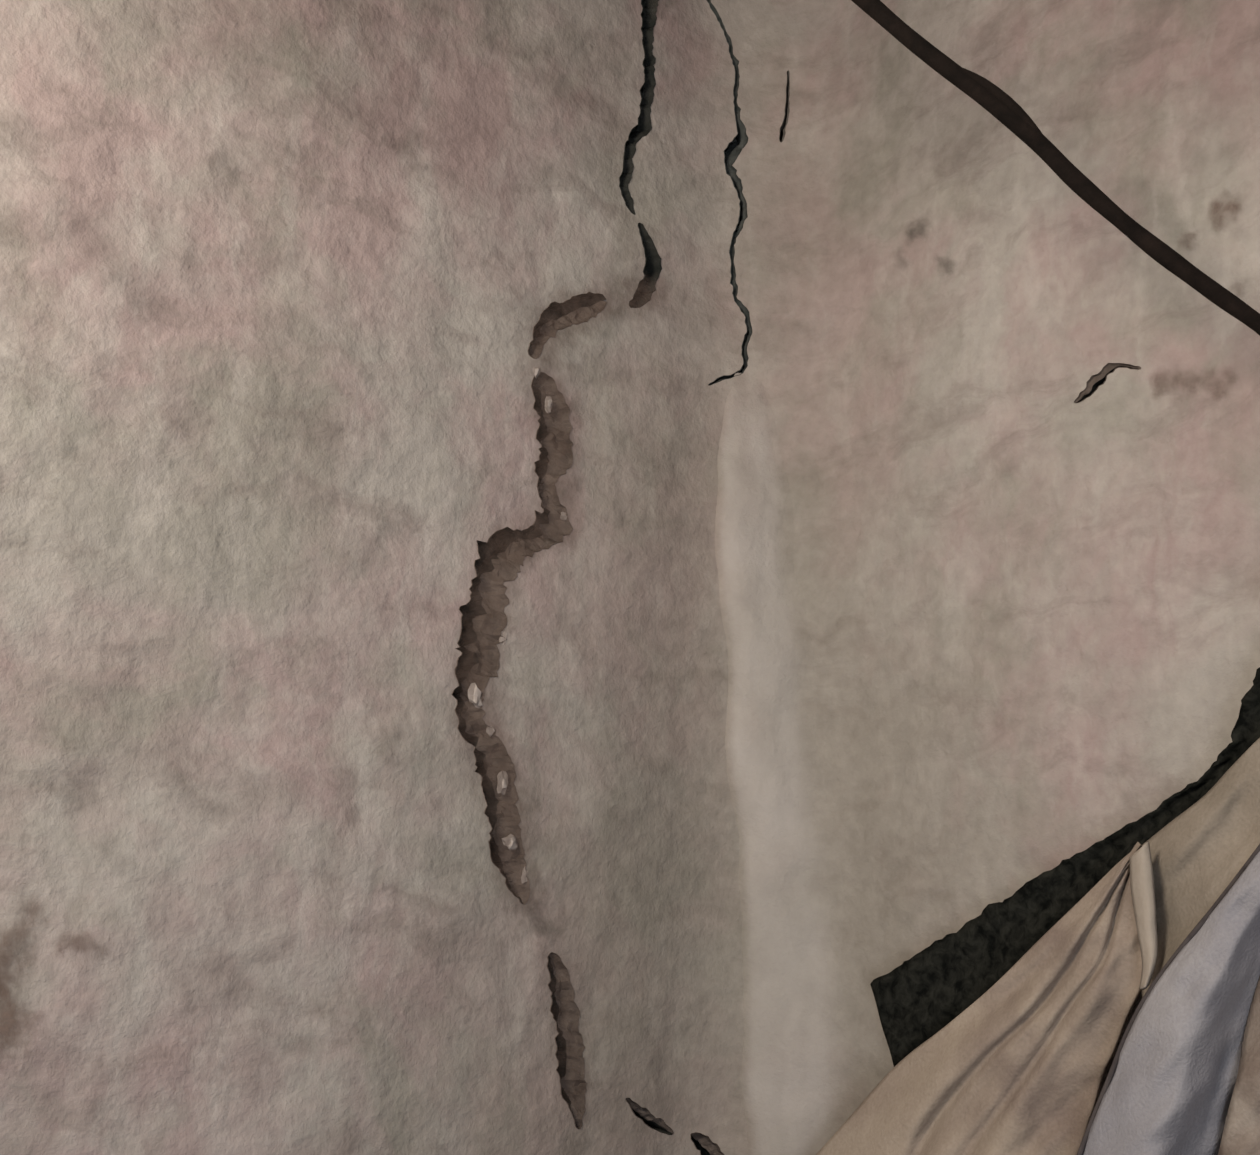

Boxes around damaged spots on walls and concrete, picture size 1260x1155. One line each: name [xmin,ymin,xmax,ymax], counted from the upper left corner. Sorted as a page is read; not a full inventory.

crack [706,0,752,386]
crack [779,71,790,142]
crack [451,0,662,905]
crack [547,952,587,1129]
crack [625,1098,724,1155]